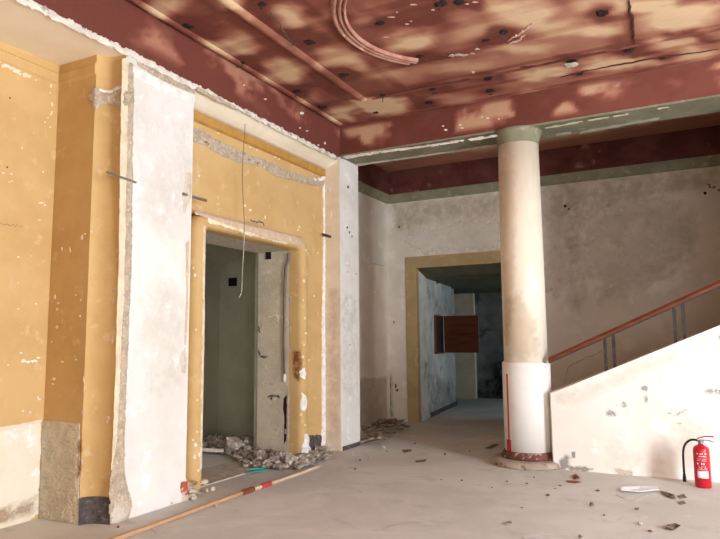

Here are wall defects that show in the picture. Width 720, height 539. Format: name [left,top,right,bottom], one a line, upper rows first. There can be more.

spalling [133,61,195,103]
crack [387,0,719,95]
corrosion [293,352,302,380]
spalling [0,410,83,529]